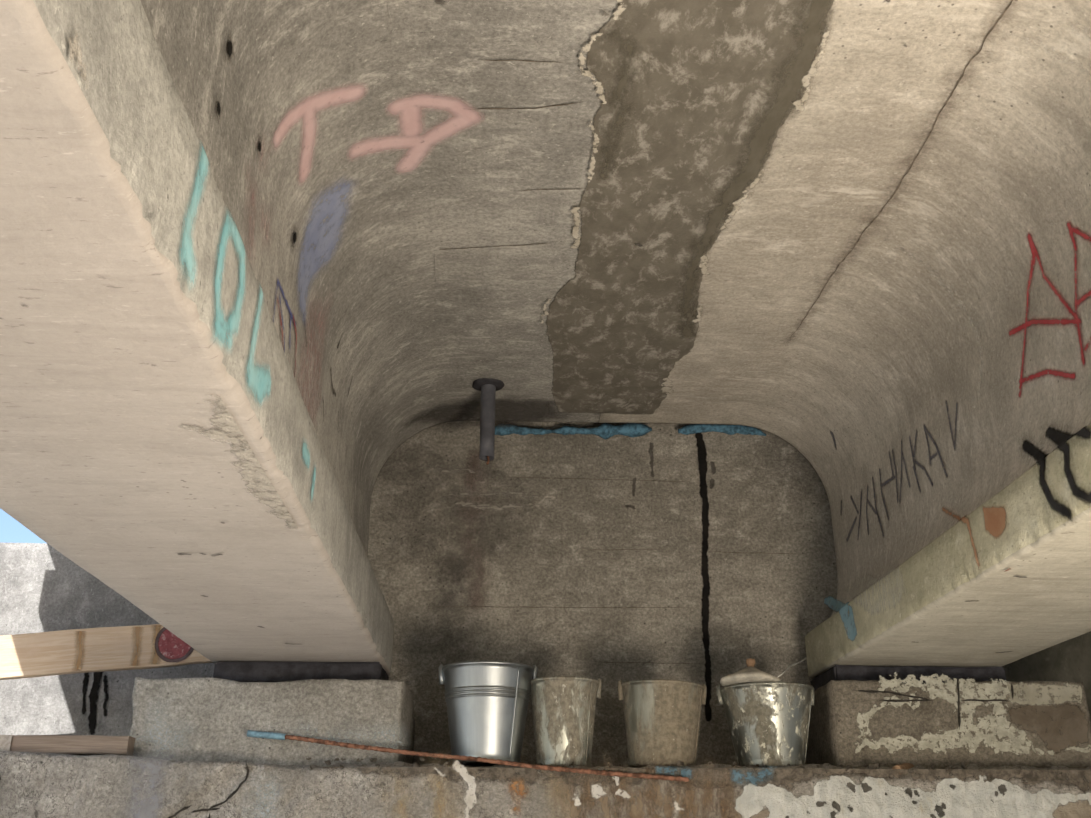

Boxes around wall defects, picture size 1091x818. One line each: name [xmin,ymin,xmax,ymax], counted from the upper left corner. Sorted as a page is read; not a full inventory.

crack [790,0,1013,340]
crack [695,433,712,722]
peeling [853,672,1091,756]
crack [168,763,249,818]
peeling [357,767,1091,818]